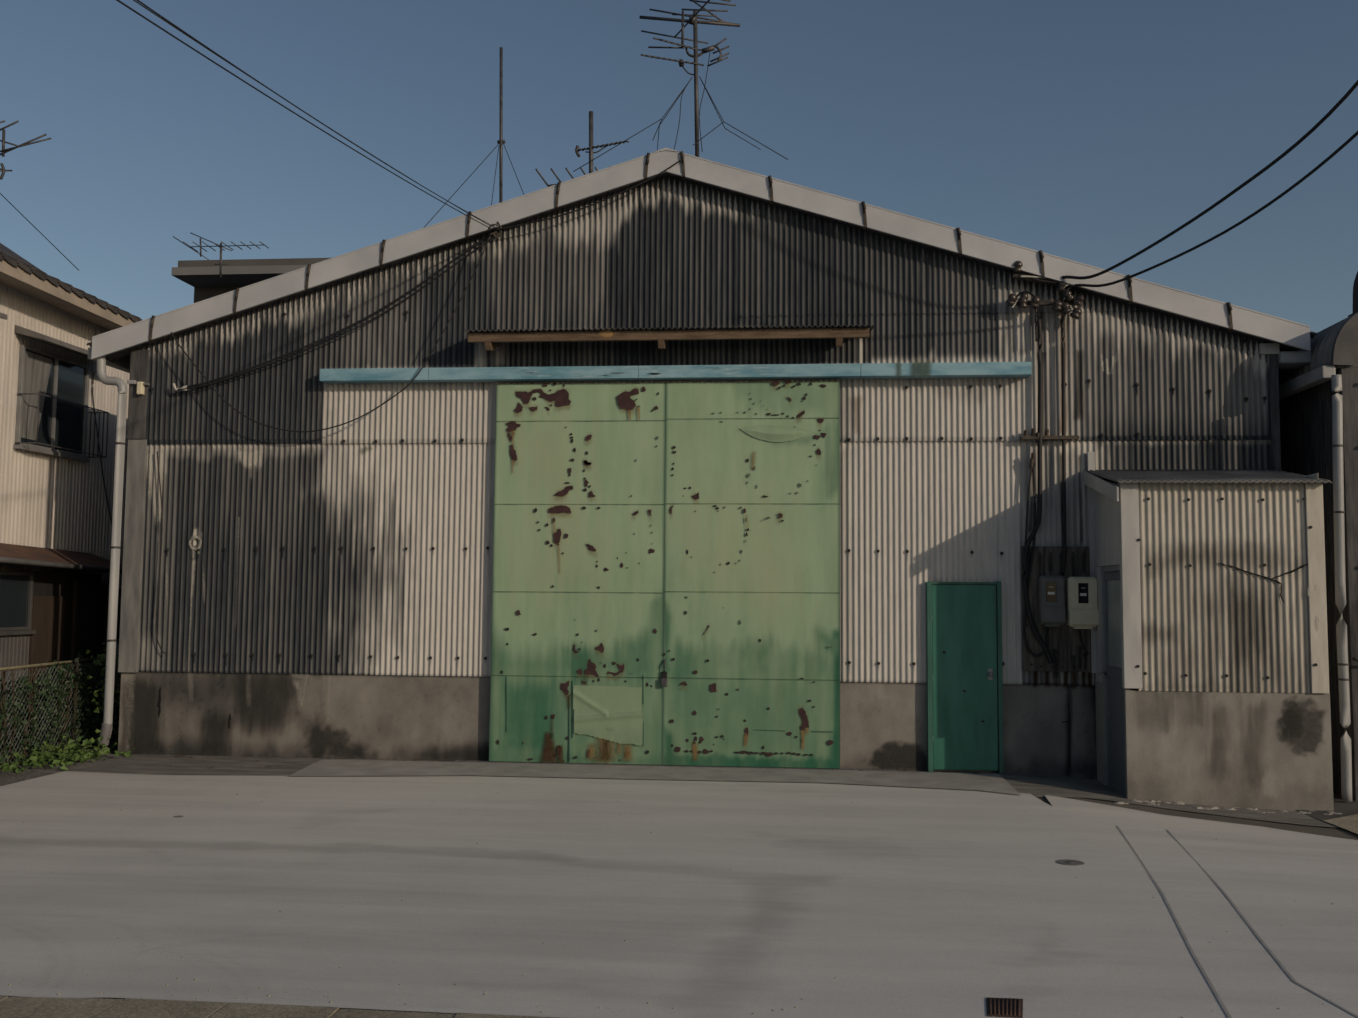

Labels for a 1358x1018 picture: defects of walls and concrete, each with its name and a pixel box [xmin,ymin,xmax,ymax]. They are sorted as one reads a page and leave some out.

water stain [147,453,164,521]
water stain [126,681,157,752]
water stain [309,727,361,757]
corrosion [542,731,563,763]
corrosion [589,739,631,762]
water stain [871,742,927,771]
water stain [1279,702,1323,751]